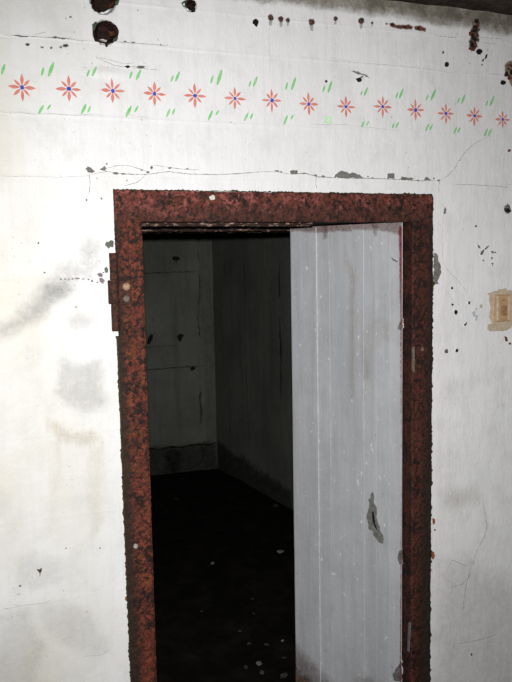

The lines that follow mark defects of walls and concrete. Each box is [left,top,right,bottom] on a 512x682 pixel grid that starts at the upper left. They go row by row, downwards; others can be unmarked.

damp [290,0,512,34]
rust [386,23,426,32]
rust [469,19,483,55]
crack [56,137,511,232]
peeling [432,249,441,370]
peeling [468,288,512,345]
peeling [366,491,384,544]